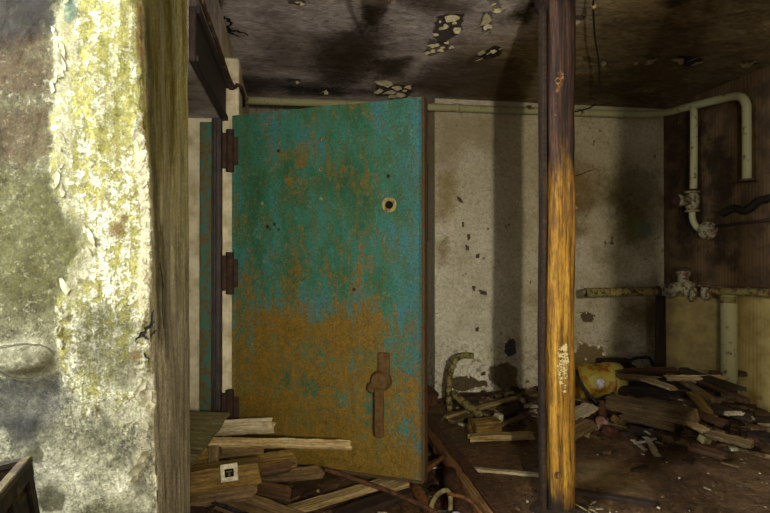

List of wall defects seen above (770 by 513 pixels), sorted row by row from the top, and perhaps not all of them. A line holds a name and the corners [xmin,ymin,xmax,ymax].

water stain [242,7,411,94]
peeling [423,14,464,58]
peeling [475,46,505,62]
peeling [477,3,506,36]
peeling [374,80,413,98]
water stain [412,58,521,98]
peeling [579,312,595,323]
peeling [574,341,606,363]